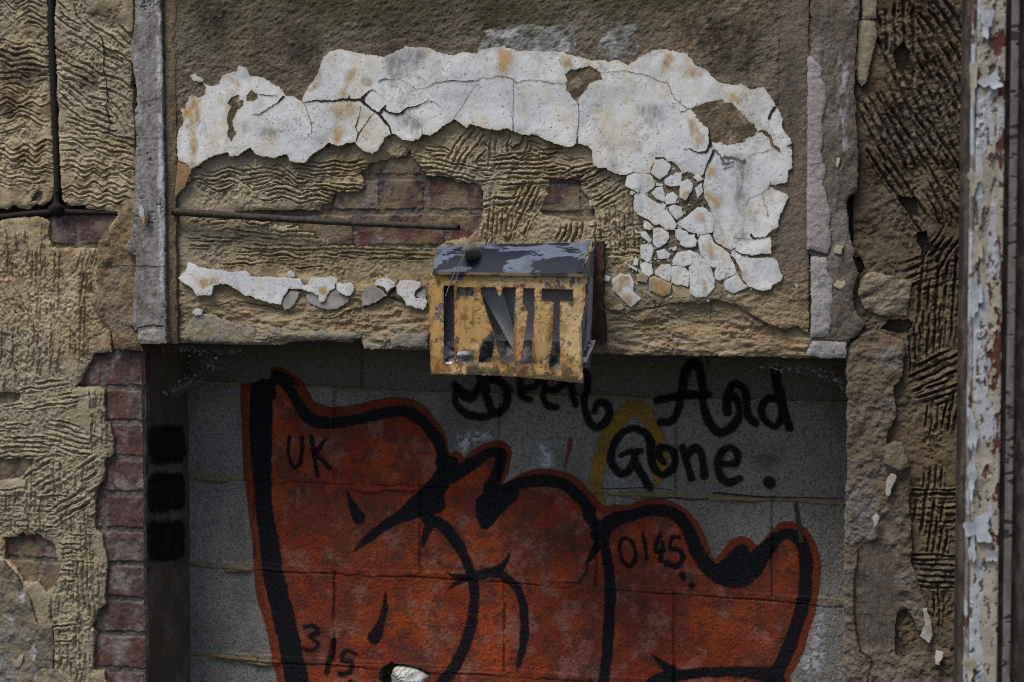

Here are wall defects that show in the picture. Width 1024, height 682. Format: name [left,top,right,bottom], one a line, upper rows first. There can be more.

flaking render [855,0,877,86]
peeling [980,5,994,39]
crack [253,75,579,144]
peeling [969,62,1003,109]
flaking render [175,46,793,291]
flaking render [32,191,118,248]
crack [604,70,873,357]
flaking render [178,262,428,316]
flaking render [881,319,913,333]
peeling [967,410,978,501]
flaking render [6,532,61,590]
peeling [963,512,997,563]